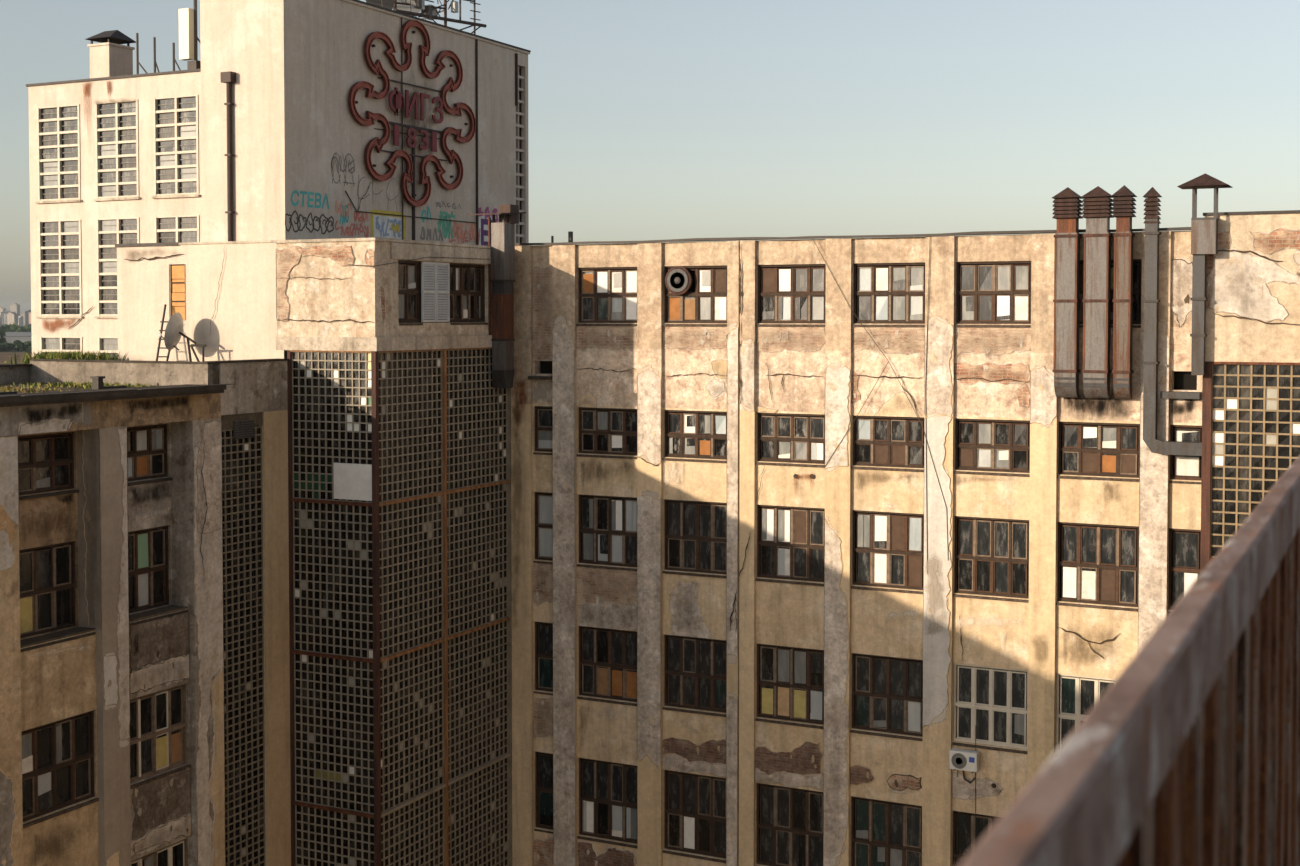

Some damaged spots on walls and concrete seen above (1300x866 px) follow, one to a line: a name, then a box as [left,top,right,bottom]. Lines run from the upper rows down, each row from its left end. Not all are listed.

spalling [276,244,375,322]
peeling [532,265,825,866]
peeling [755,516,922,866]
peeling [825,316,1057,729]
crack [1057,627,1119,659]
peeling [1138,227,1300,651]